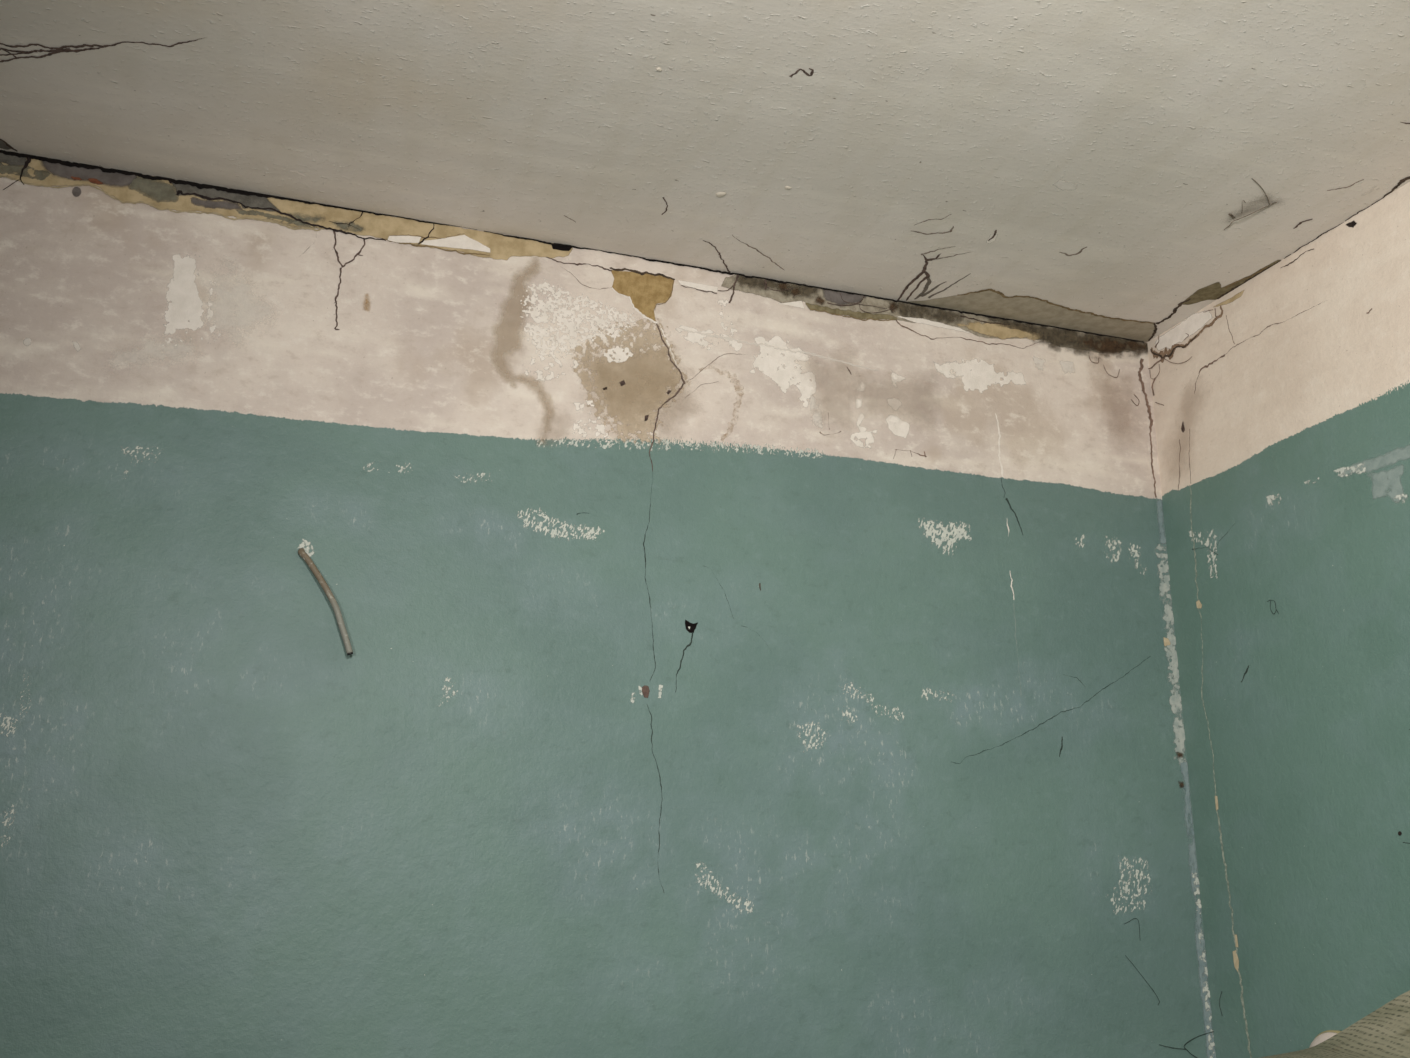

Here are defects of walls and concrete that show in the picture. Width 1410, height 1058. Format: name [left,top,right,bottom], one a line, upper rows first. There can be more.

crack [0,38,202,62]
spalling [0,153,572,260]
crack [1266,176,1410,270]
peeling [117,254,269,364]
water stain [574,319,687,443]
crack [0,139,1321,498]
spalling [520,260,1281,449]
crack [1001,478,1023,535]
peeling [1304,463,1407,502]
crack [643,323,745,892]
crack [953,656,1150,764]
crack [1189,485,1252,1058]